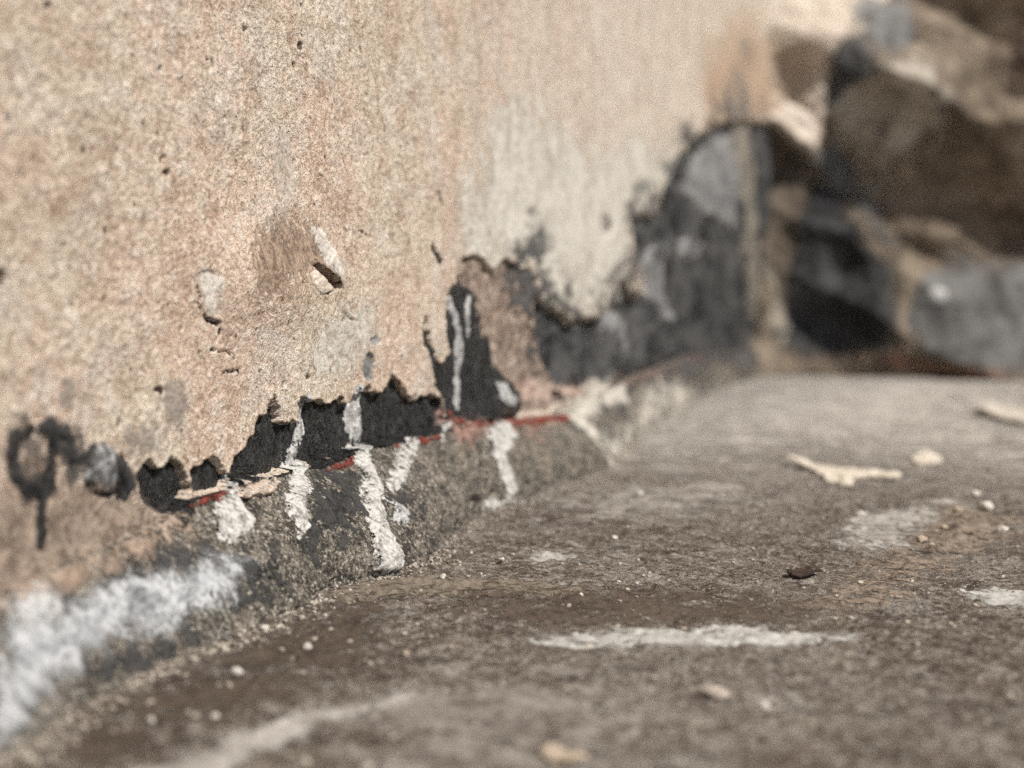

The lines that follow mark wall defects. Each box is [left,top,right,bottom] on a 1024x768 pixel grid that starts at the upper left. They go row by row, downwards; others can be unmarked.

spalling [0,96,821,607]